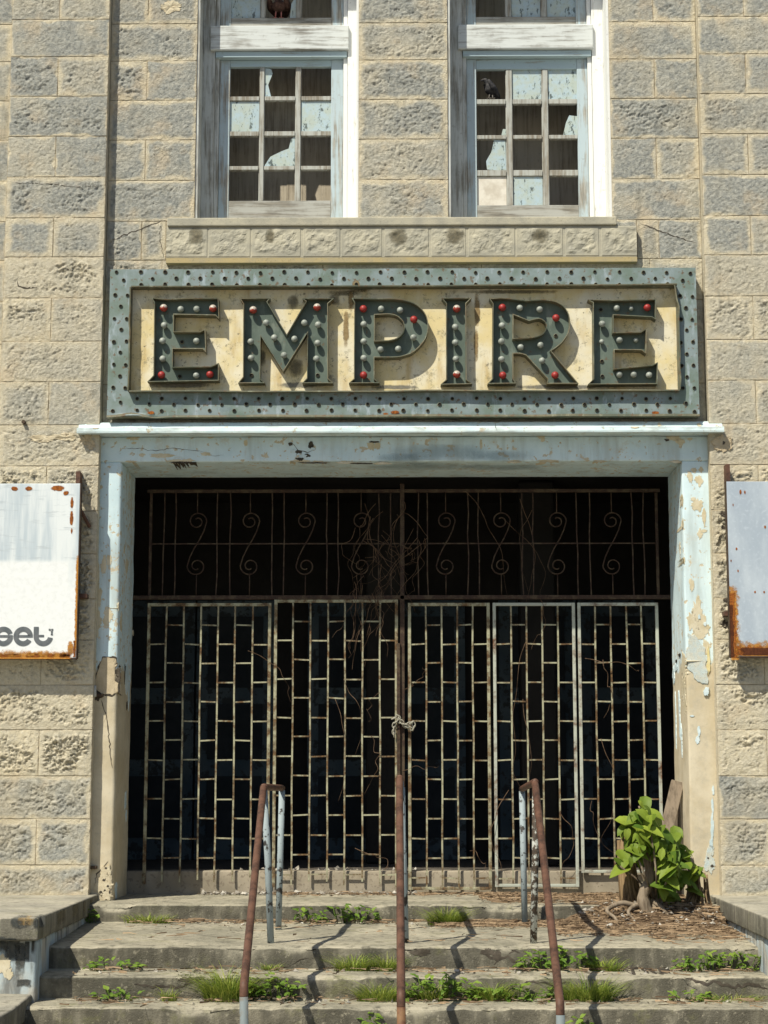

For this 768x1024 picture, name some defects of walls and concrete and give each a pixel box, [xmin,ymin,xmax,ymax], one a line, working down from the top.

corrosion [51,485,74,533]
peeling [671,460,707,565]
corrosion [0,557,78,659]
corrosion [729,586,768,660]
flaking render [95,656,130,711]
crack [101,701,112,765]